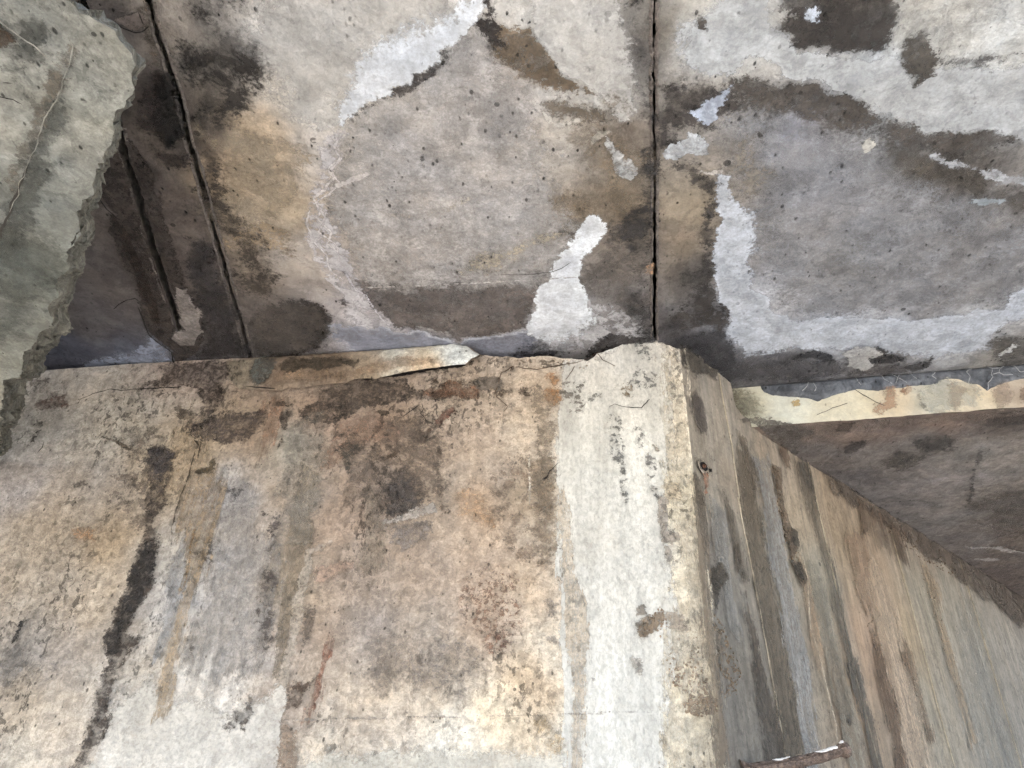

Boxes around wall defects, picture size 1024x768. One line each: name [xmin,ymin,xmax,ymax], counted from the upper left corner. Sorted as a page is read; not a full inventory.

crack [119,12,148,33]
spalling [101,2,482,391]
damp [651,0,1024,366]
damp [69,0,821,768]
damp [723,359,907,382]
damp [885,436,958,472]
damp [918,377,980,412]
corrosion [739,740,852,768]
damp [798,536,883,768]
damp [827,474,1024,768]